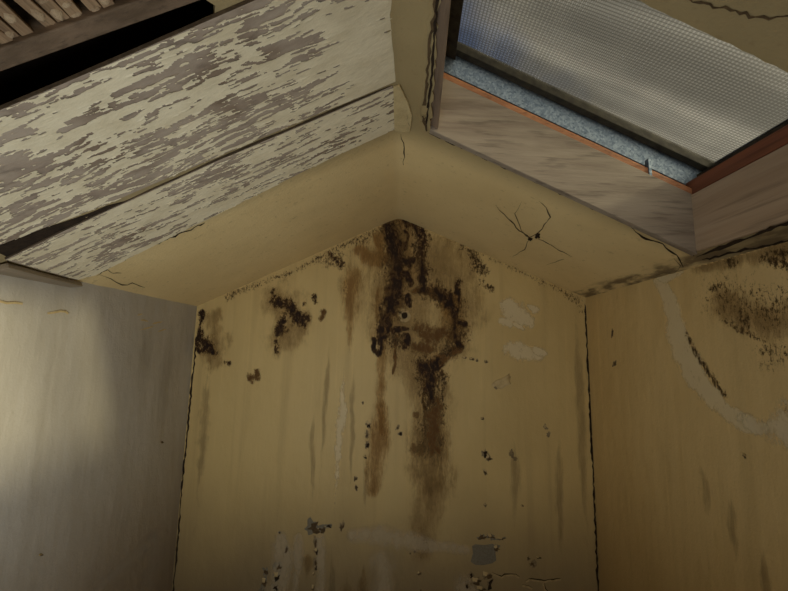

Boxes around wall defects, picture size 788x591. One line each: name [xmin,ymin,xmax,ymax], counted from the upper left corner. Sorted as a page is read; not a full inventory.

crack [689,0,788,21]
peeling [0,0,395,280]
crack [497,194,570,264]
leakage [460,244,523,291]
leakage [759,249,788,271]
leakage [195,309,218,355]
leakage [225,219,472,495]
leakage [705,258,788,372]
peeling [465,532,506,591]